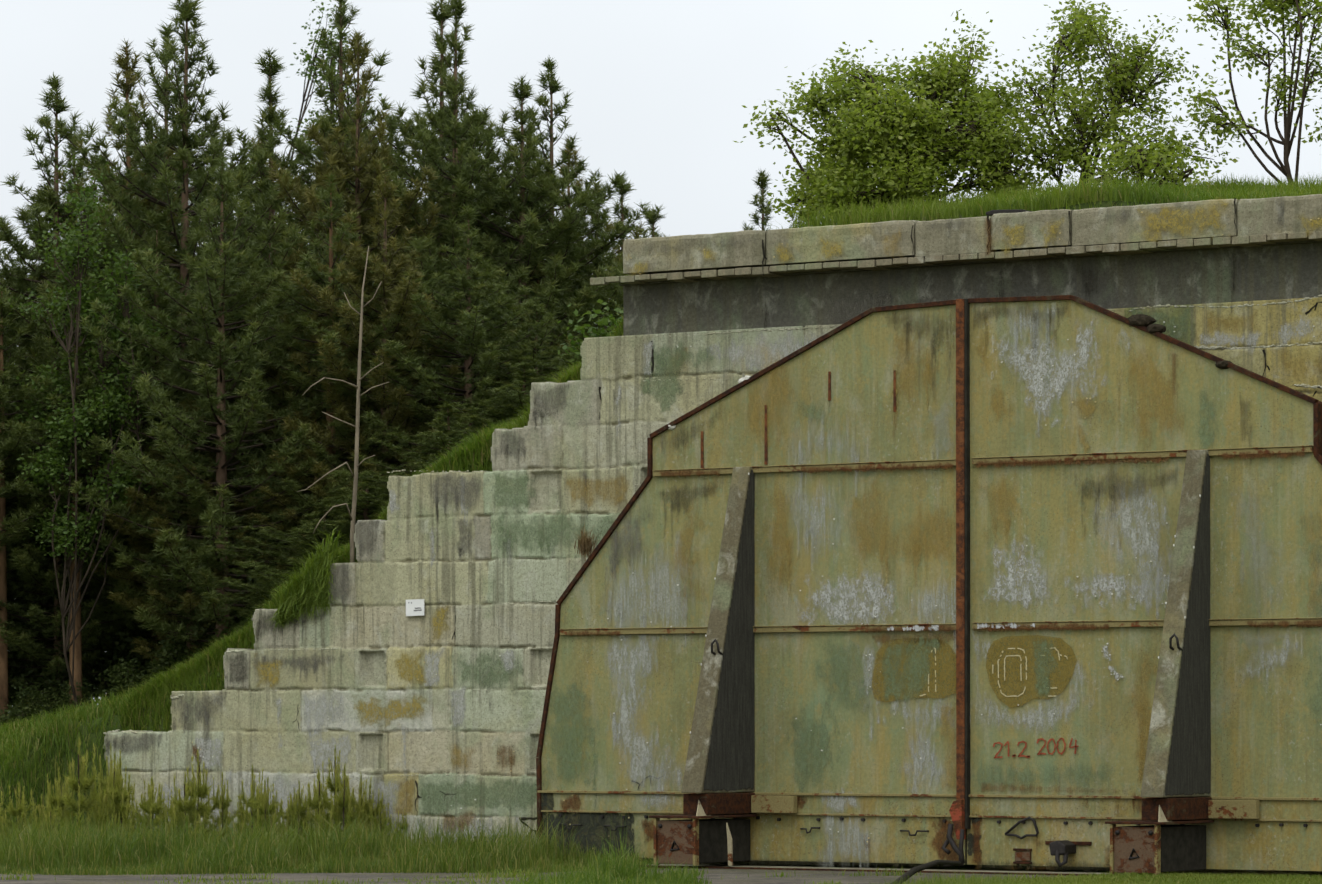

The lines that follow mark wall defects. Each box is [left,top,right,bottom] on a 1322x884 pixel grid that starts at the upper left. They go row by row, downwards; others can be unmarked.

peeling [995,308,1097,430]
water stain [431,475,479,562]
peeling [800,574,956,632]
peeling [988,540,1046,607]
peeling [1065,488,1176,609]
corrosion [932,818,981,863]